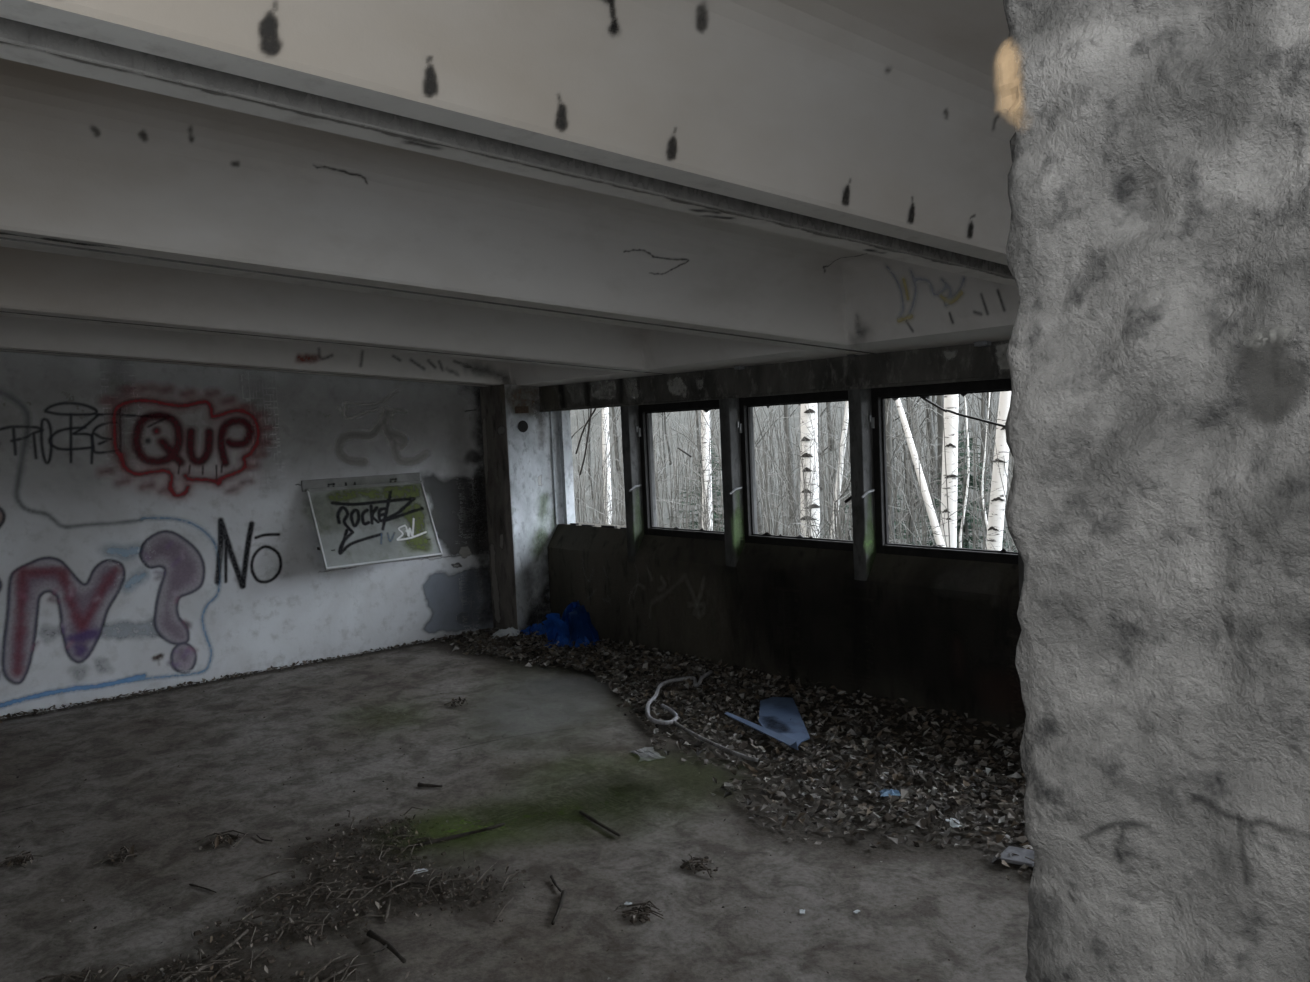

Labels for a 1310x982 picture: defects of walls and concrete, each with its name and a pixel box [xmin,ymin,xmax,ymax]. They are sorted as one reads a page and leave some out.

crack [624,249,689,274]
water stain [0,367,506,633]